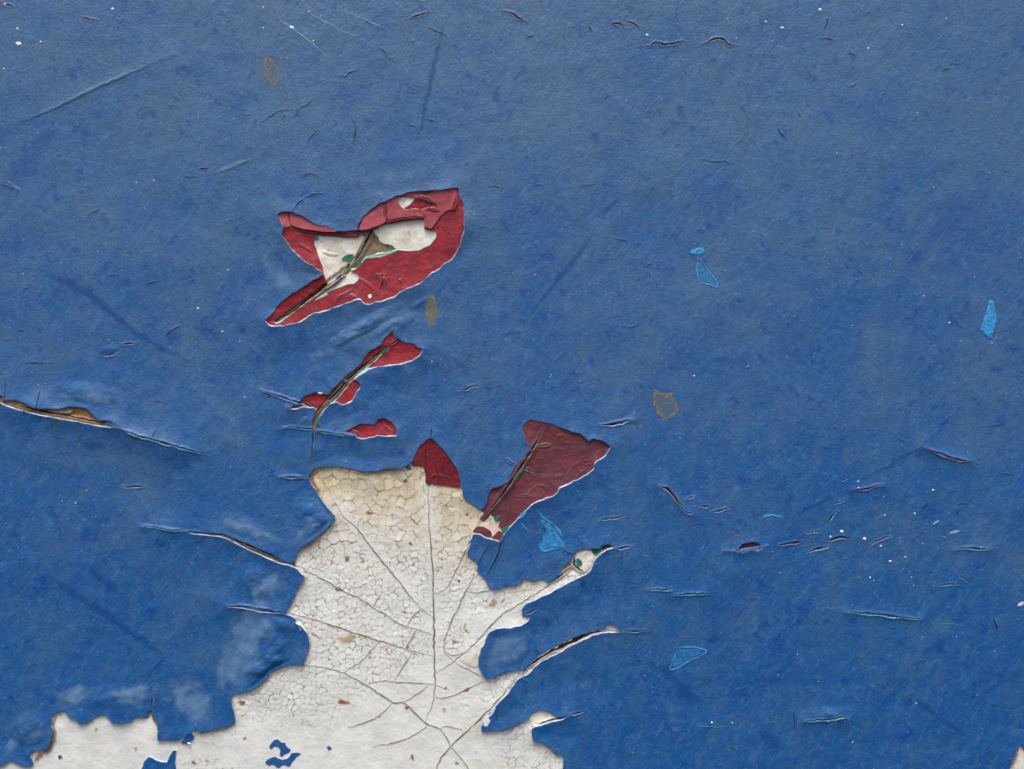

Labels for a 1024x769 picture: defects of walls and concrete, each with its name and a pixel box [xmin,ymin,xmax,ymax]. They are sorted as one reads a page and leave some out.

peeling [259,326,423,455]
peeling [265,188,464,326]
peeling [0,420,613,769]
crack [139,424,650,769]